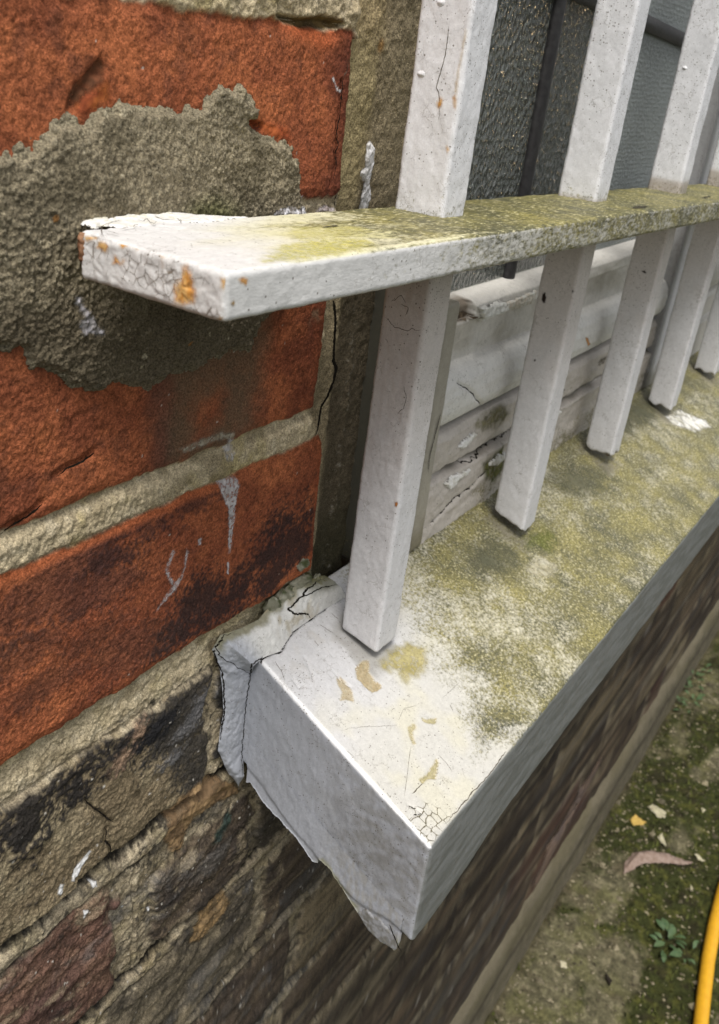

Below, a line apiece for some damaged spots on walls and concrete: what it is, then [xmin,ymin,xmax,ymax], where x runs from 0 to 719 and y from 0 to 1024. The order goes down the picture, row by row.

crack [436,28,449,119]
peeling [81,212,248,229]
crack [88,217,204,297]
rust [175,270,194,303]
crack [315,301,338,436]
leakage [624,399,711,433]
crack [56,453,94,477]
peeling [443,469,471,490]
crack [213,579,338,774]
peeling [356,661,381,692]
crack [379,753,505,841]
peeling [358,909,397,950]